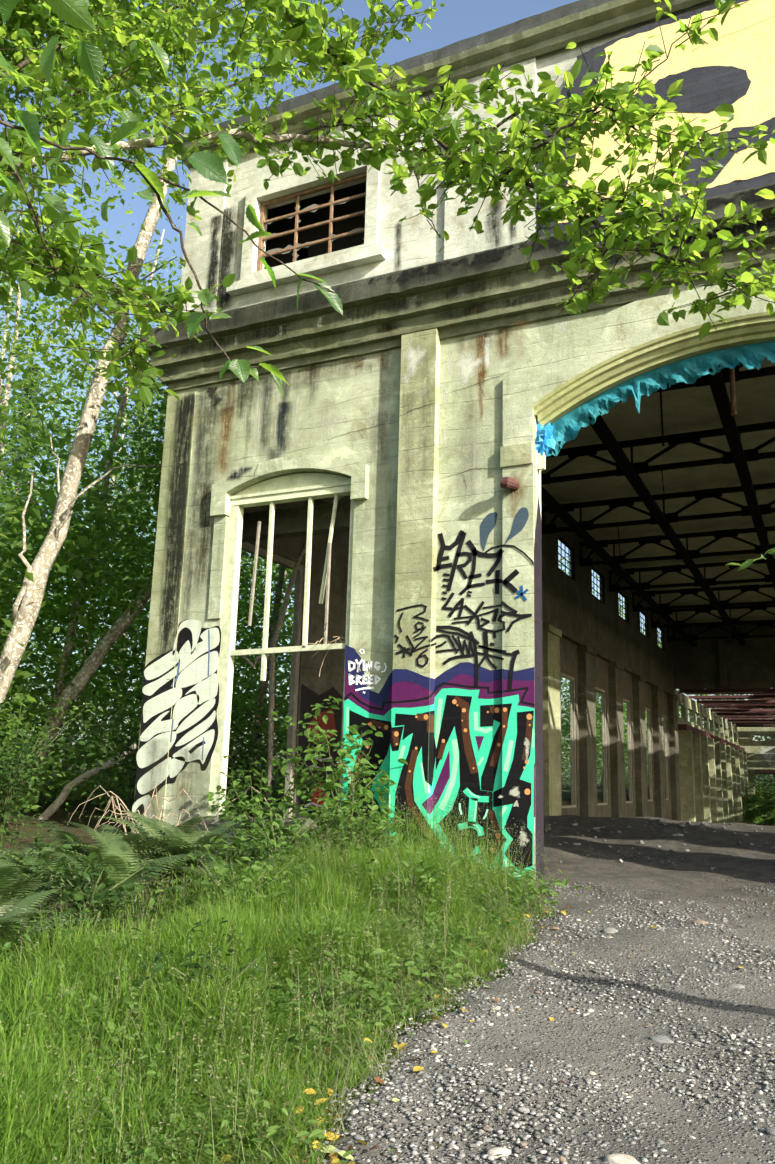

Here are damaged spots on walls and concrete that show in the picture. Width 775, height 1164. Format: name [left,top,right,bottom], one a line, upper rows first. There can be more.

damp [709,217,775,242]
damp [172,207,261,356]
damp [274,291,329,331]
damp [347,296,422,331]
corrosion [477,328,508,381]
damp [228,375,300,459]
damp [161,393,218,654]